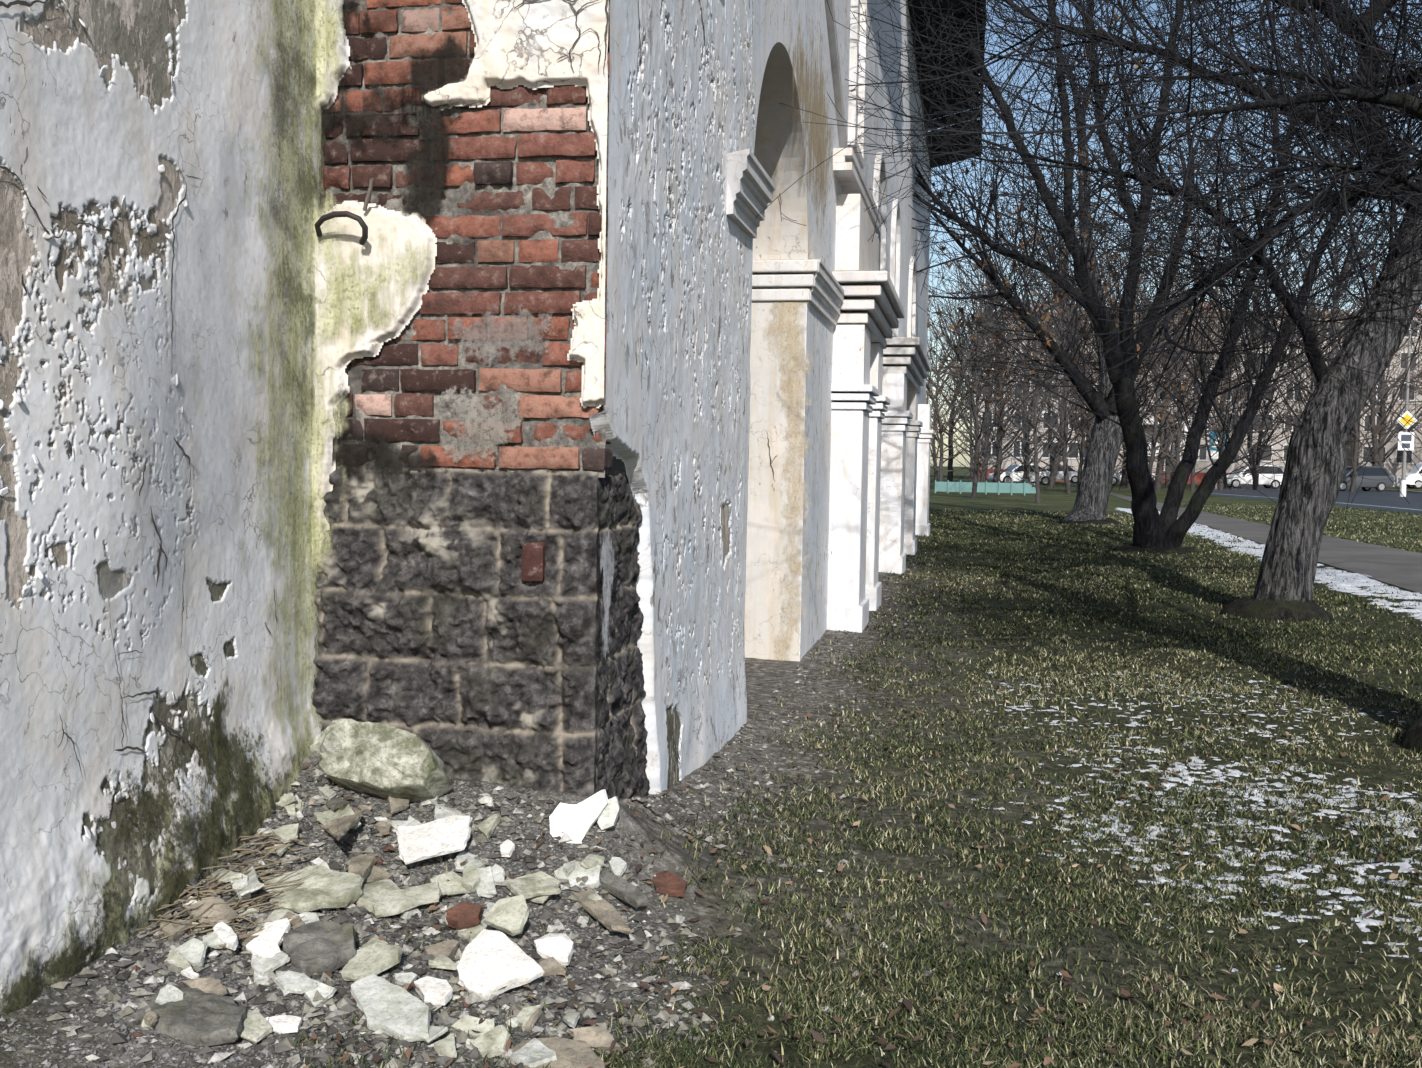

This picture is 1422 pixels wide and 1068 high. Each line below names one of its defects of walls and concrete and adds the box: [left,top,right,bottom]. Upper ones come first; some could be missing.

crack [0,0,48,8]
flaking render [20,0,187,112]
crack [513,0,641,74]
damp [270,1,322,422]
peeling [0,156,196,649]
spalling [311,0,650,801]
crack [139,438,191,649]
peeling [206,578,230,601]
crack [58,713,83,778]
crack [108,599,212,791]
flaking render [666,706,681,789]
damp [0,716,284,1016]